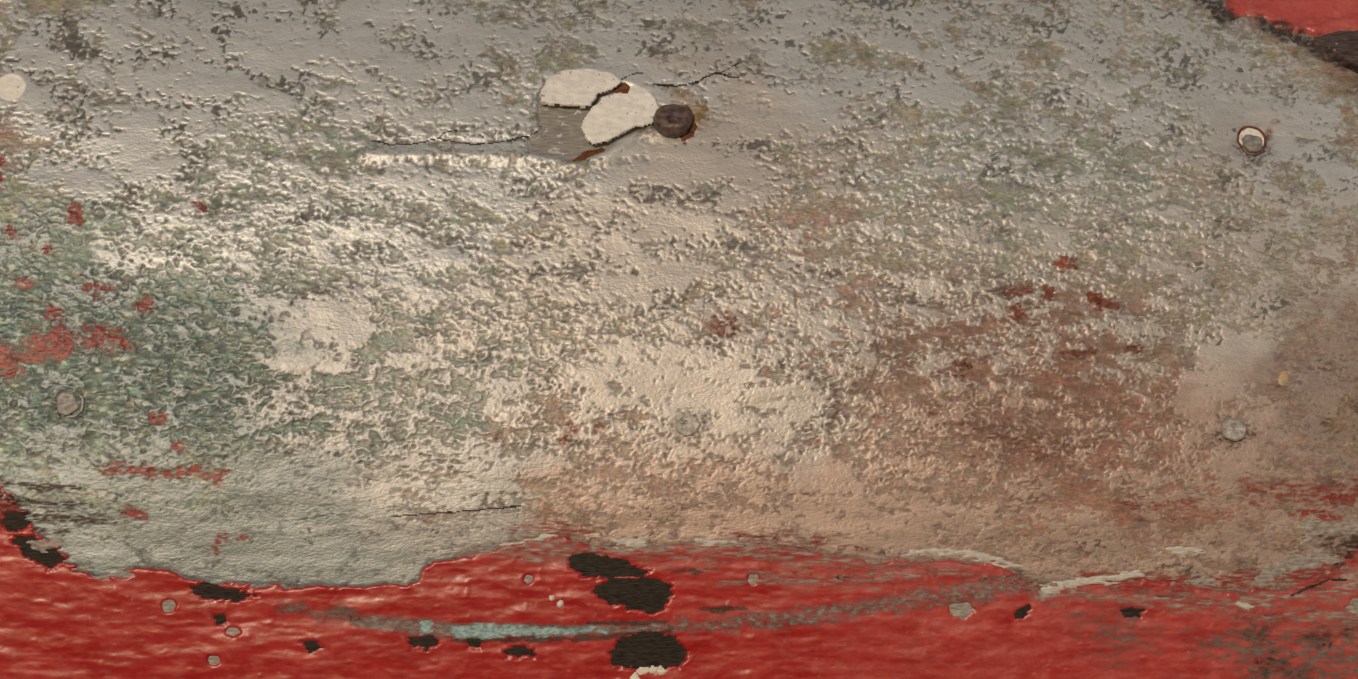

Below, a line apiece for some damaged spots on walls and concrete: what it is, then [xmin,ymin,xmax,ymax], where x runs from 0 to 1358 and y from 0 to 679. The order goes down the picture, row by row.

peeling [603,541,710,559]
peeling [713,544,796,564]
peeling [881,552,985,566]
peeling [548,545,673,614]
peeling [721,569,970,587]
peeling [1105,577,1156,591]
peeling [1282,561,1346,583]
peeling [1051,586,1215,610]
peeling [1217,591,1308,610]
peeling [1255,598,1358,644]
peeling [349,616,473,651]
peeling [467,623,687,669]